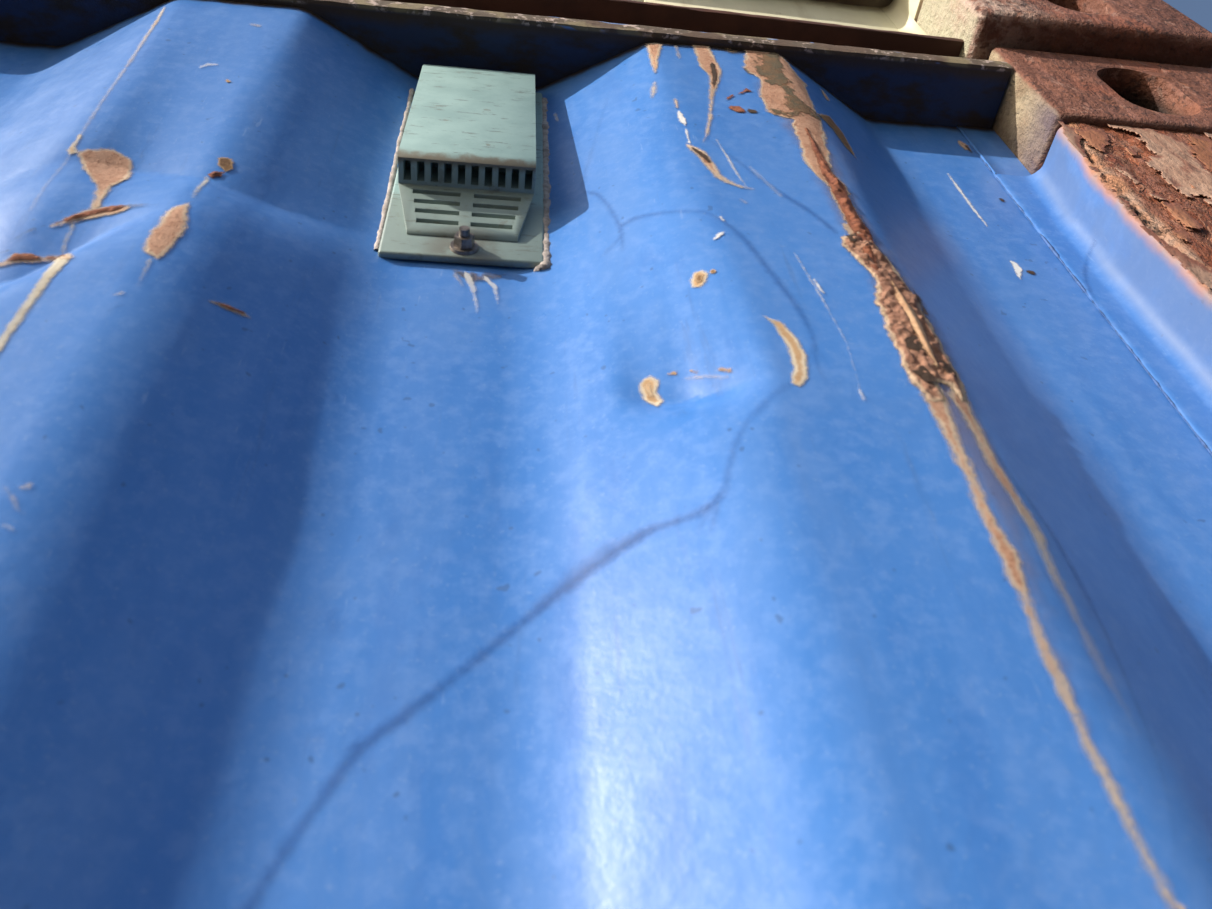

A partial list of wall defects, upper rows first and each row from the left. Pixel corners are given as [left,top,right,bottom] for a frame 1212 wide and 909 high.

peeling [1058,121,1212,289]
spalling [212,301,247,316]
spalling [768,318,807,385]
corrosion [744,50,1135,834]